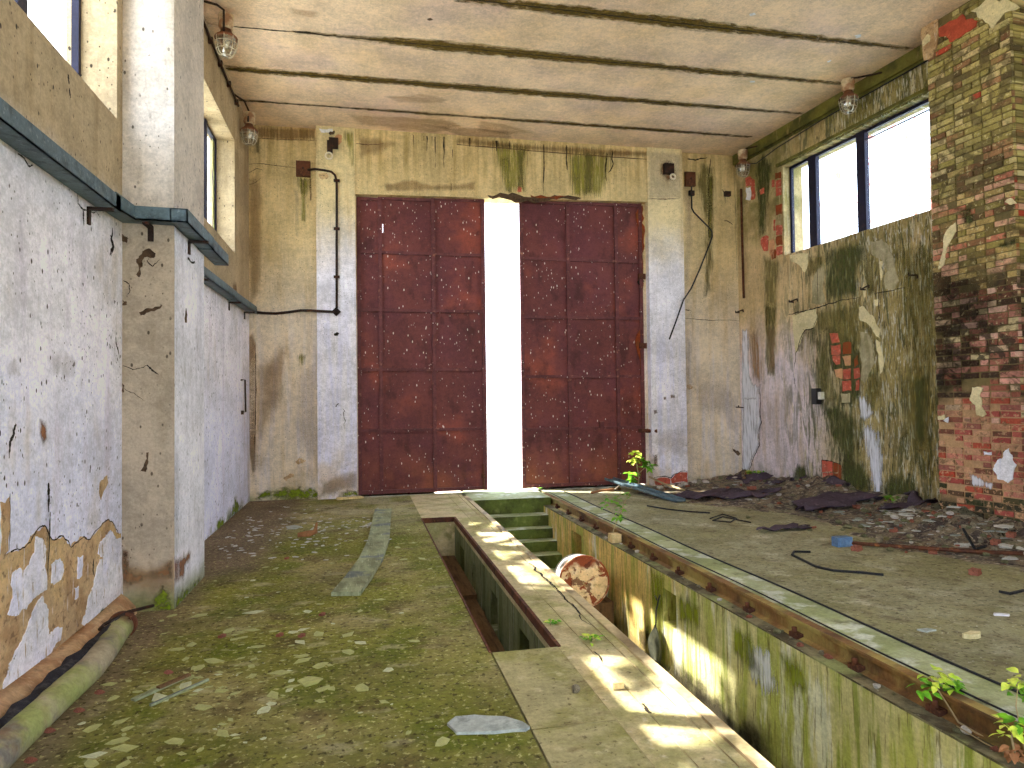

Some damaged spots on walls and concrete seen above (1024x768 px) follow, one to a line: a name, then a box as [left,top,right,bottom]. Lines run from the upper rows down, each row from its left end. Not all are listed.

flaking render [971,0,1020,28]
spalling [122,248,159,305]
flaking render [745,172,825,374]
flaking render [829,239,899,406]
flaking render [938,222,956,269]
damp [249,336,257,471]
damp [860,397,883,492]
flaking render [0,498,123,690]
crack [529,563,591,625]
damp [639,626,649,648]
damp [657,662,762,755]
damp [748,644,773,695]